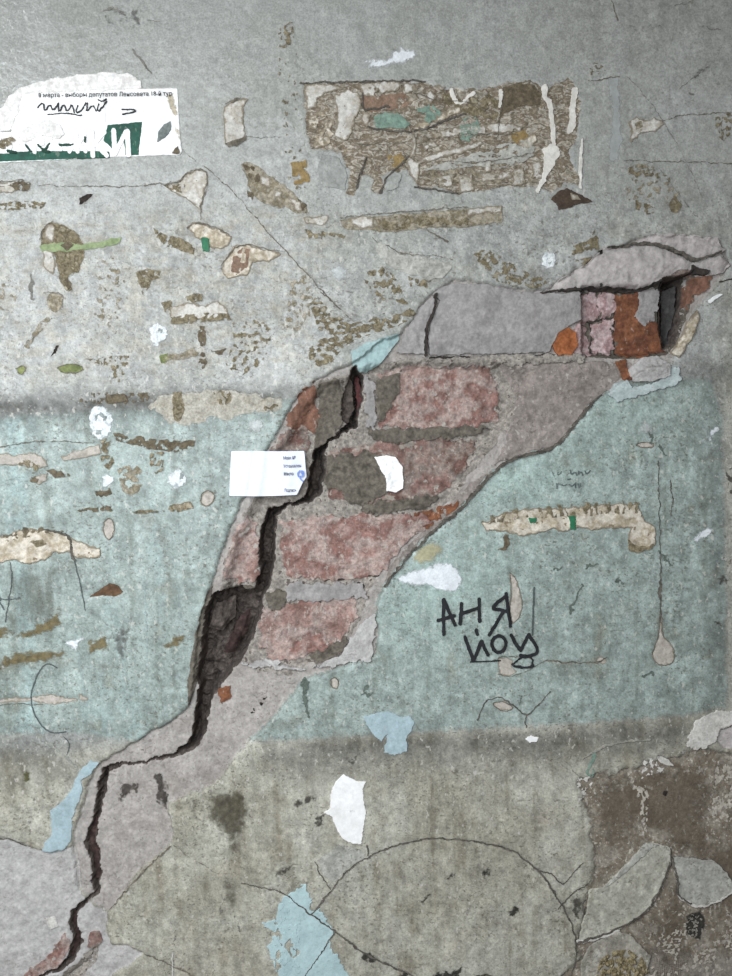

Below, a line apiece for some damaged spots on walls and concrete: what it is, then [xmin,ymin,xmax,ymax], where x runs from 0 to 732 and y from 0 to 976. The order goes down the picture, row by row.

crack [424,293,438,357]
crack [0,440,92,448]
crack [39,366,364,976]
flaking render [0,251,732,976]
crack [477,691,551,728]
crack [241,829,591,976]